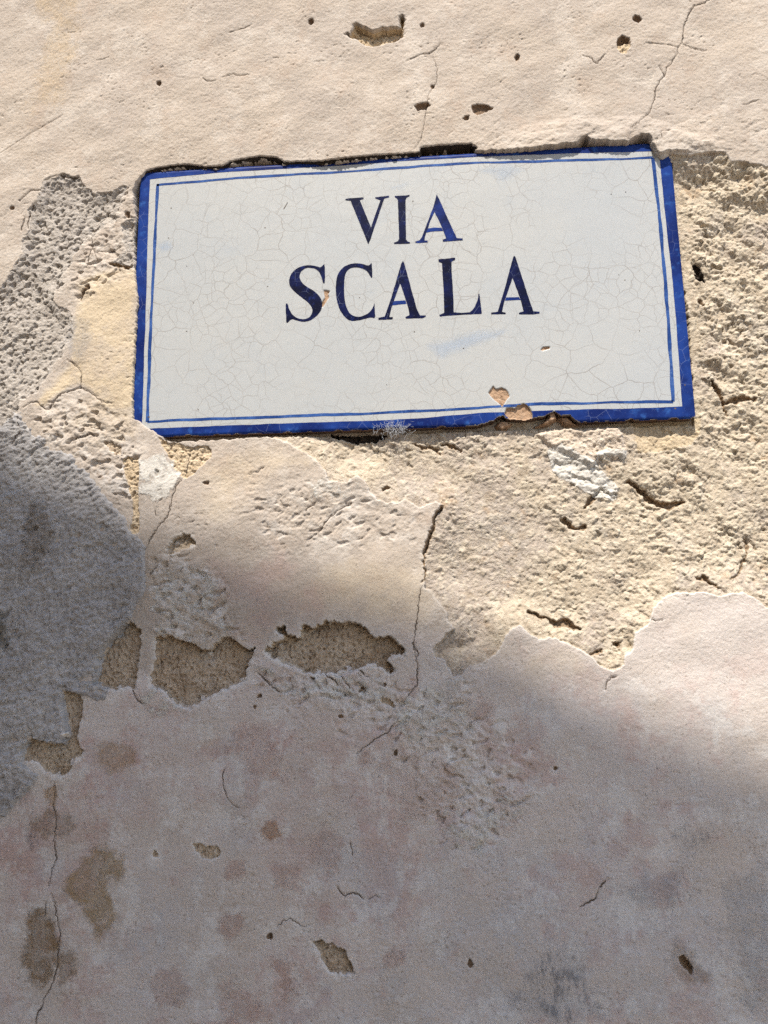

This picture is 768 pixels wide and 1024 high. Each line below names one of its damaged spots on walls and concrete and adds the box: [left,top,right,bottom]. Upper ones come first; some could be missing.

spalling [347,17,405,47]
crack [632,0,708,136]
peeling [0,174,138,426]
spalling [104,441,140,534]
crack [625,480,685,511]
spalling [98,622,142,690]
spalling [150,619,405,708]
crack [359,505,444,753]
crack [527,610,622,656]
spalling [25,691,84,777]
crack [36,788,61,1019]
spalling [313,939,354,978]